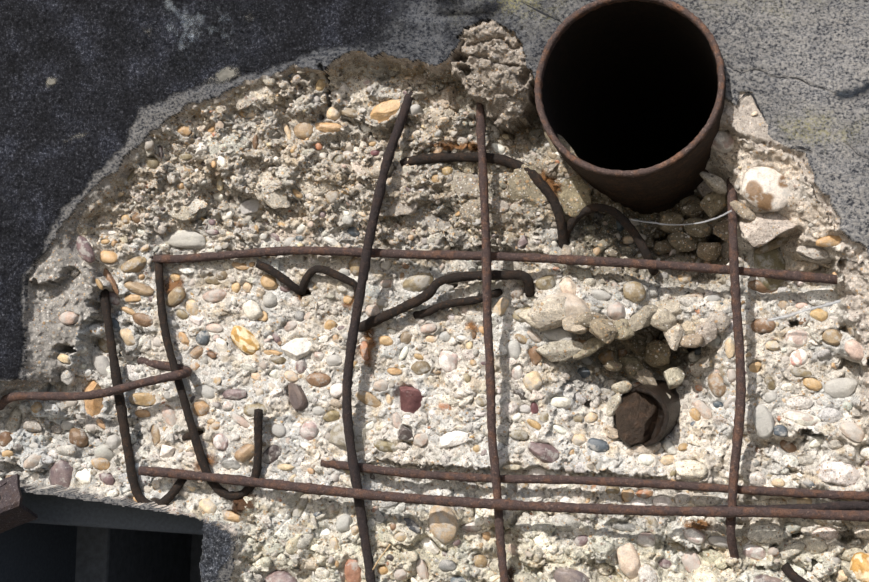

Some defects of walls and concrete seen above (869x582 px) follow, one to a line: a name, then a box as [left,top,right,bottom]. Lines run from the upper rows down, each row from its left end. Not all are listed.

leakage [436,0,504,41]
crack [731,68,869,120]
corrosion [431,141,490,151]
leakage [0,0,418,381]
corrosion [541,172,561,196]
corrosion [164,278,183,294]
spalling [0,40,493,582]
spalling [484,78,869,507]
corrosion [363,329,376,367]
corrosion [231,493,254,514]
spalling [364,500,869,582]
corrosion [684,519,711,533]